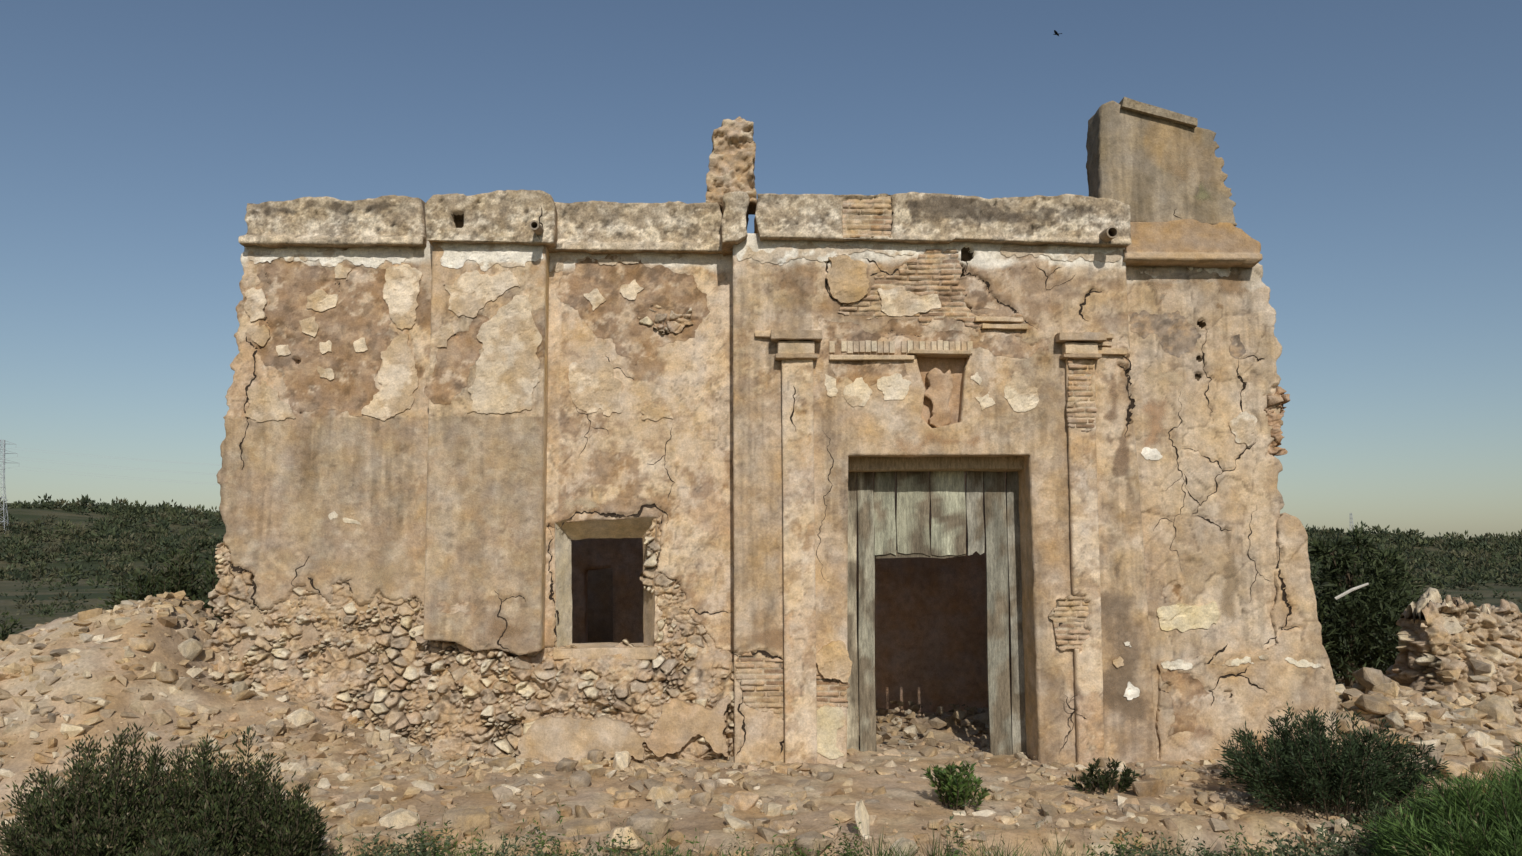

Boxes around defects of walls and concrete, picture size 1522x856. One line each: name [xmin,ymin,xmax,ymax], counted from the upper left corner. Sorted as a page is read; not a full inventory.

flaking render [244,259,542,422]
flaking render [555,254,710,417]
flaking render [818,247,1050,412]
crack [957,252,1037,329]
crack [1036,266,1102,321]
flaking render [1065,359,1098,432]
flaking render [203,515,784,764]
crack [494,428,674,658]
flaking render [1048,594,1090,653]
crack [1153,321,1300,706]